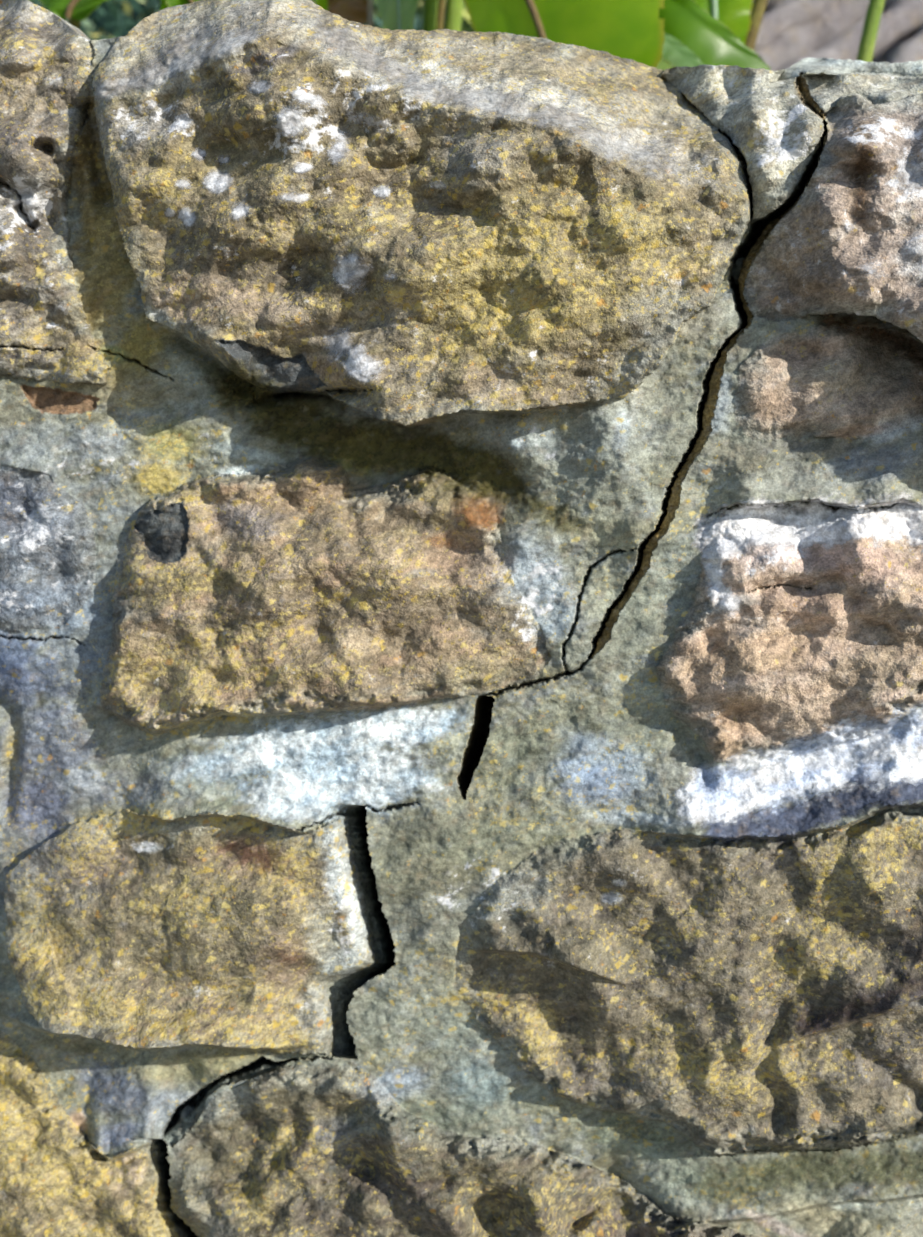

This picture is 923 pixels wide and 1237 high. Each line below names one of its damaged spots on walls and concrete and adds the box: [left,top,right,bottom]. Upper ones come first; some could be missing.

crack [456,72,828,800]
crack [150,804,407,1237]